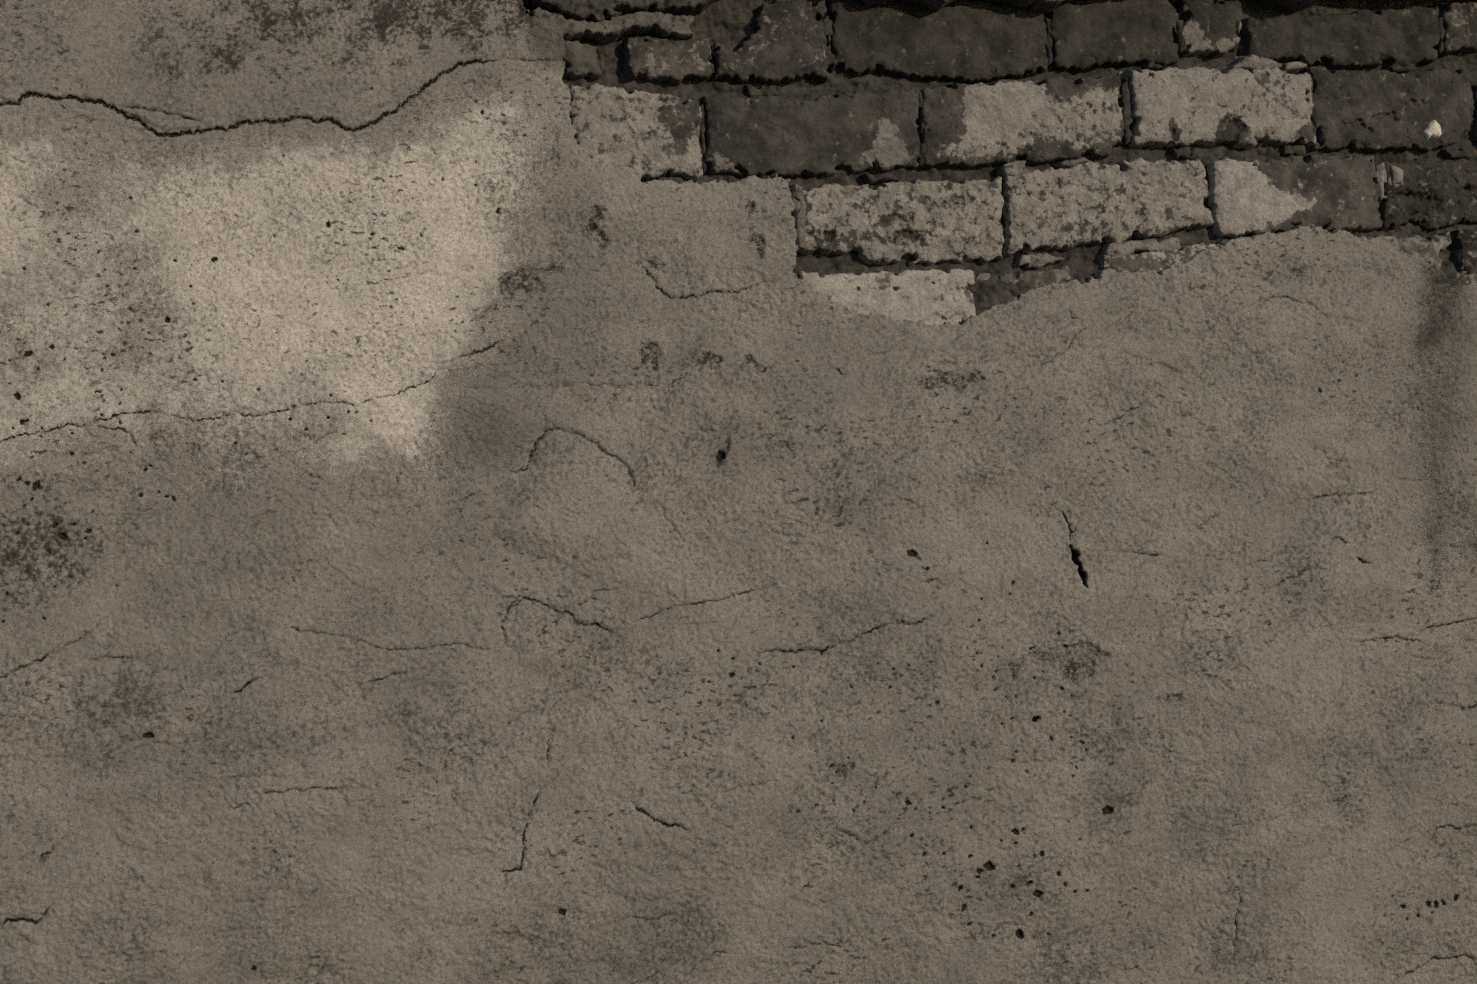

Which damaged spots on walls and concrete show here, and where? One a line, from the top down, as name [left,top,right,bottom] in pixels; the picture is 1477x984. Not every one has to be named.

crack [0,12,531,137]
flaking render [562,0,1477,326]
crack [0,310,498,444]
crack [515,428,639,489]